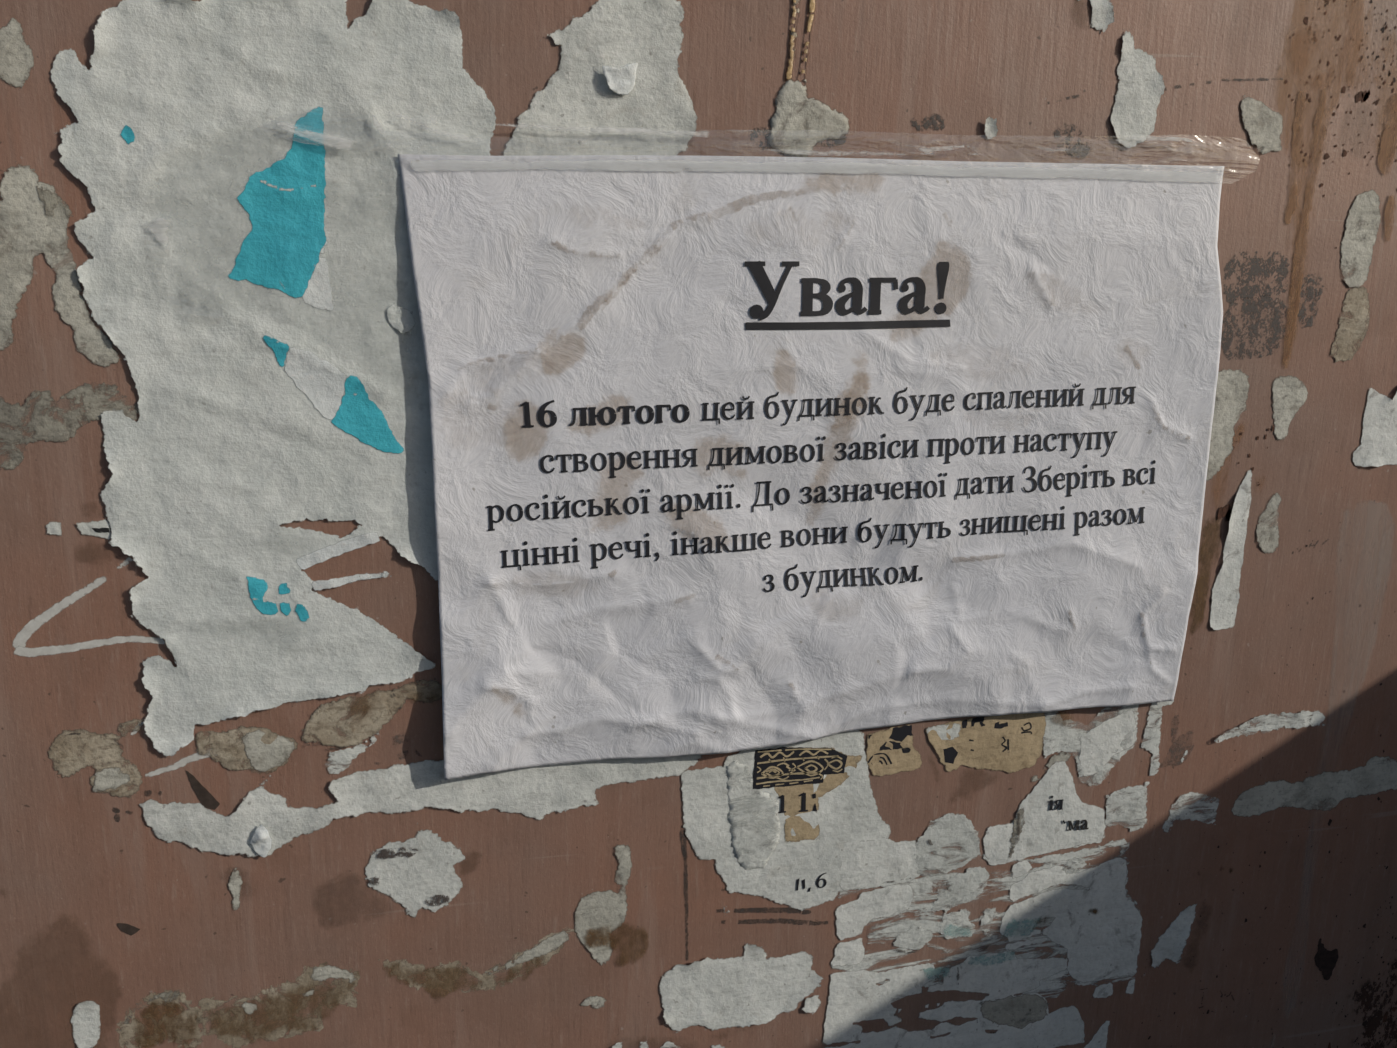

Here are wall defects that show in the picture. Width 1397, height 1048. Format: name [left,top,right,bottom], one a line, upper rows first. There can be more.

rust [1342,86,1370,103]
rust [1263,896,1397,1048]